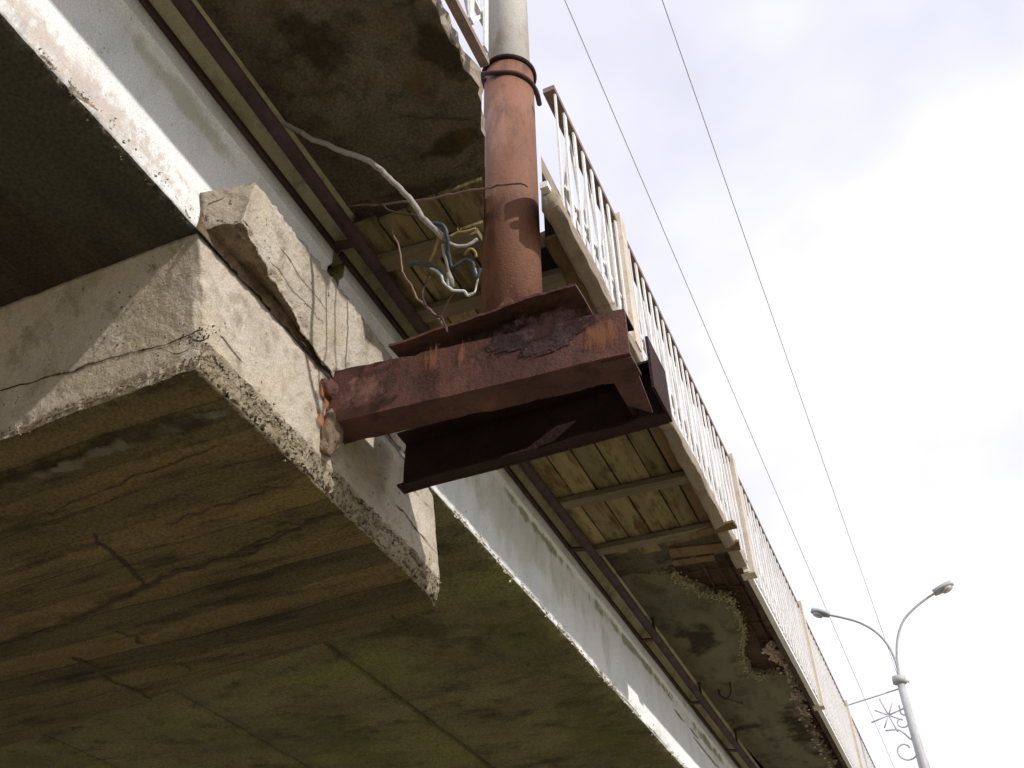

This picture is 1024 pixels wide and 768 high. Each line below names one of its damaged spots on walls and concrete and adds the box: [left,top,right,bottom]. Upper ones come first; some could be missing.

damp [409,0,462,71]
crack [276,242,324,307]
crack [0,324,245,391]
crack [295,333,331,378]
rust [485,307,617,359]
damp [0,411,224,487]
spalling [668,571,838,768]